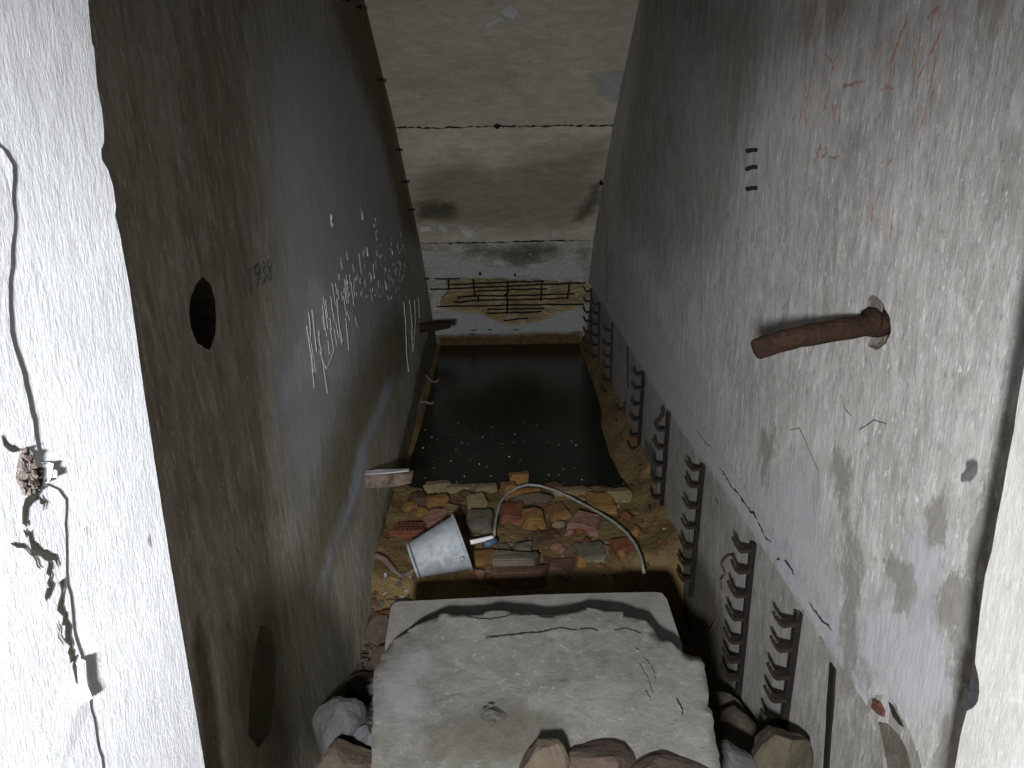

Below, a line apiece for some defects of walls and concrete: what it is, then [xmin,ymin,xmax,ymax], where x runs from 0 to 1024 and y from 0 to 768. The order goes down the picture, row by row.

water stain [264,4,451,580]
crack [1,435,78,685]
flaking render [0,148,102,768]
crack [458,611,683,714]
crack [697,431,794,575]
water stain [606,301,995,717]
crack [791,428,819,490]
crack [809,603,832,648]